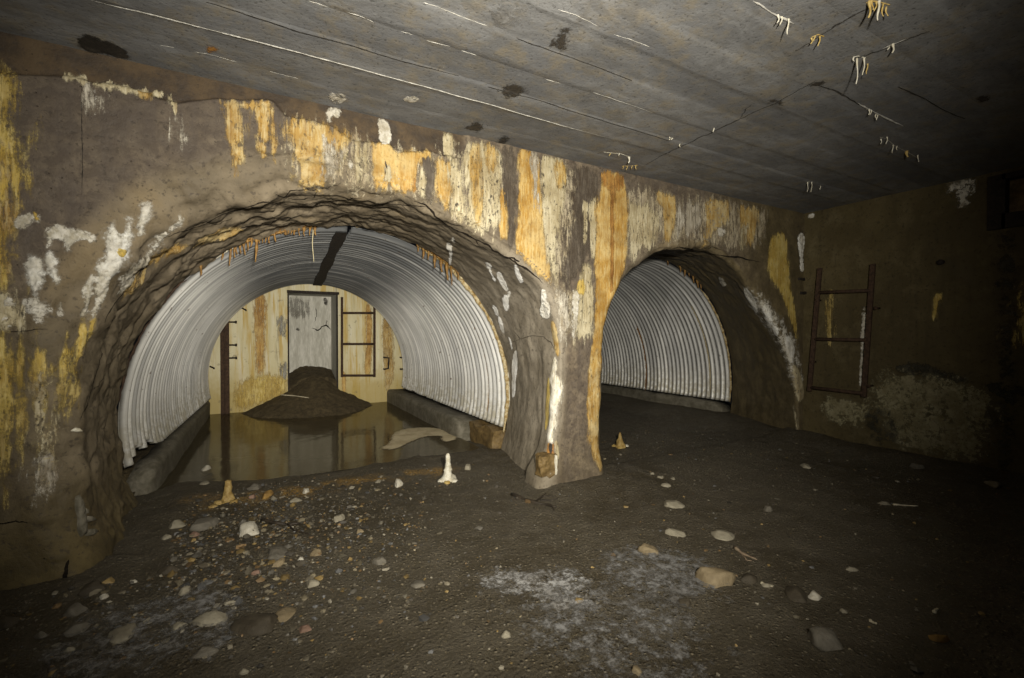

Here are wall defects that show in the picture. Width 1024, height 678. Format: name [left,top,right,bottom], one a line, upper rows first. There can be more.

crack [795,8,868,51]
crack [490,82,860,162]
crack [171,185,541,281]
water stain [950,179,976,208]
water stain [0,65,242,510]
water stain [220,93,805,471]
water stain [820,395,898,445]